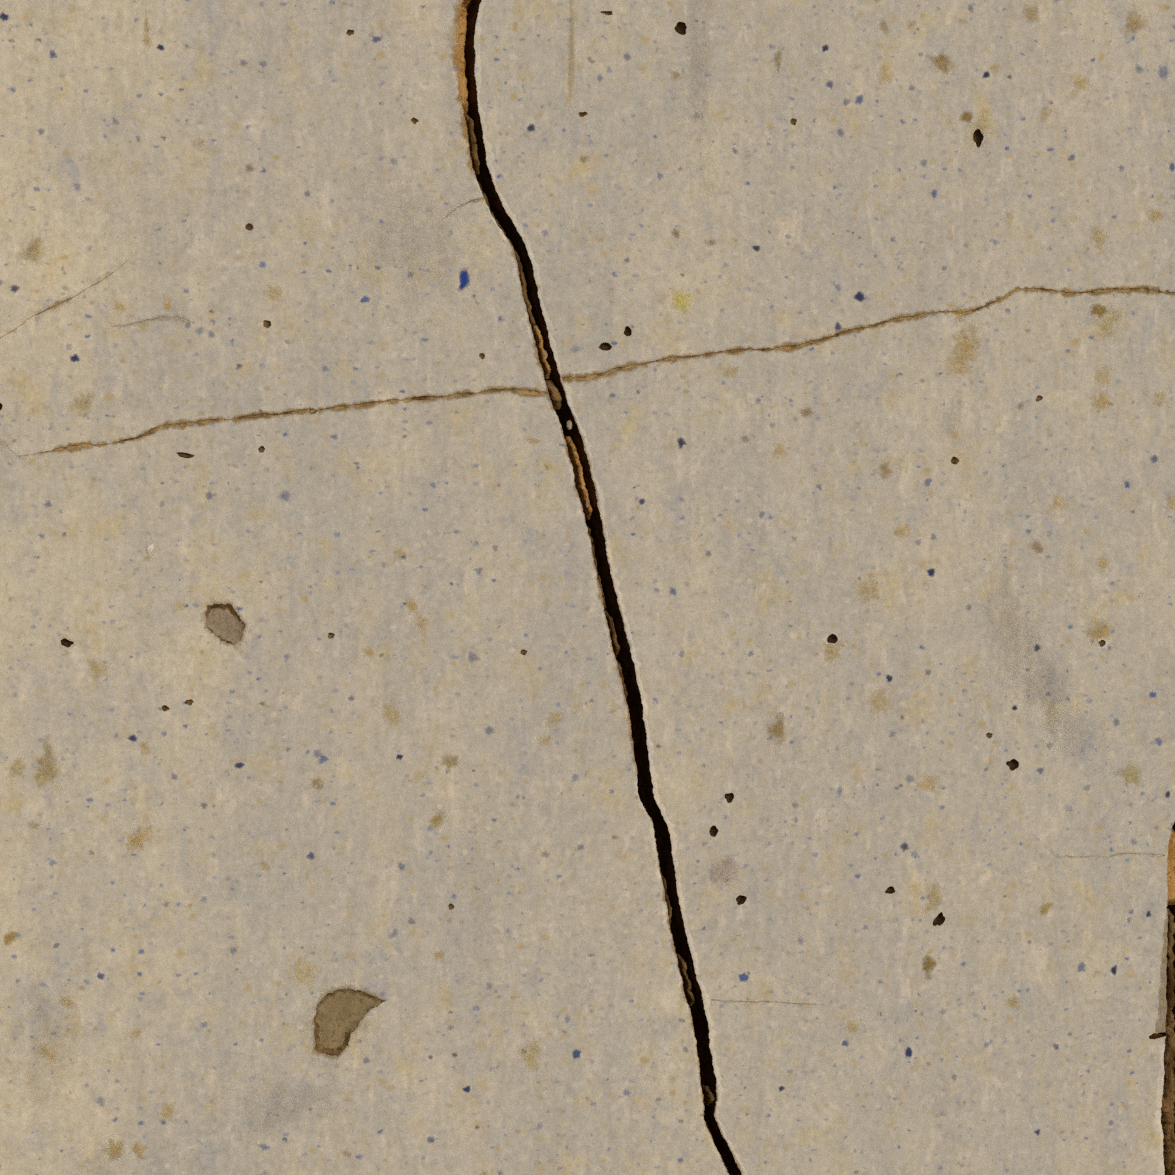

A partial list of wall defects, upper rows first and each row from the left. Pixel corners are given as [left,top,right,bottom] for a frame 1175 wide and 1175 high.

crack [0,256,133,338]
crack [562,286,1175,382]
hole [205,603,246,645]
crack [32,0,824,1175]
spalling [314,988,385,1057]
crack [1055,822,1175,1175]